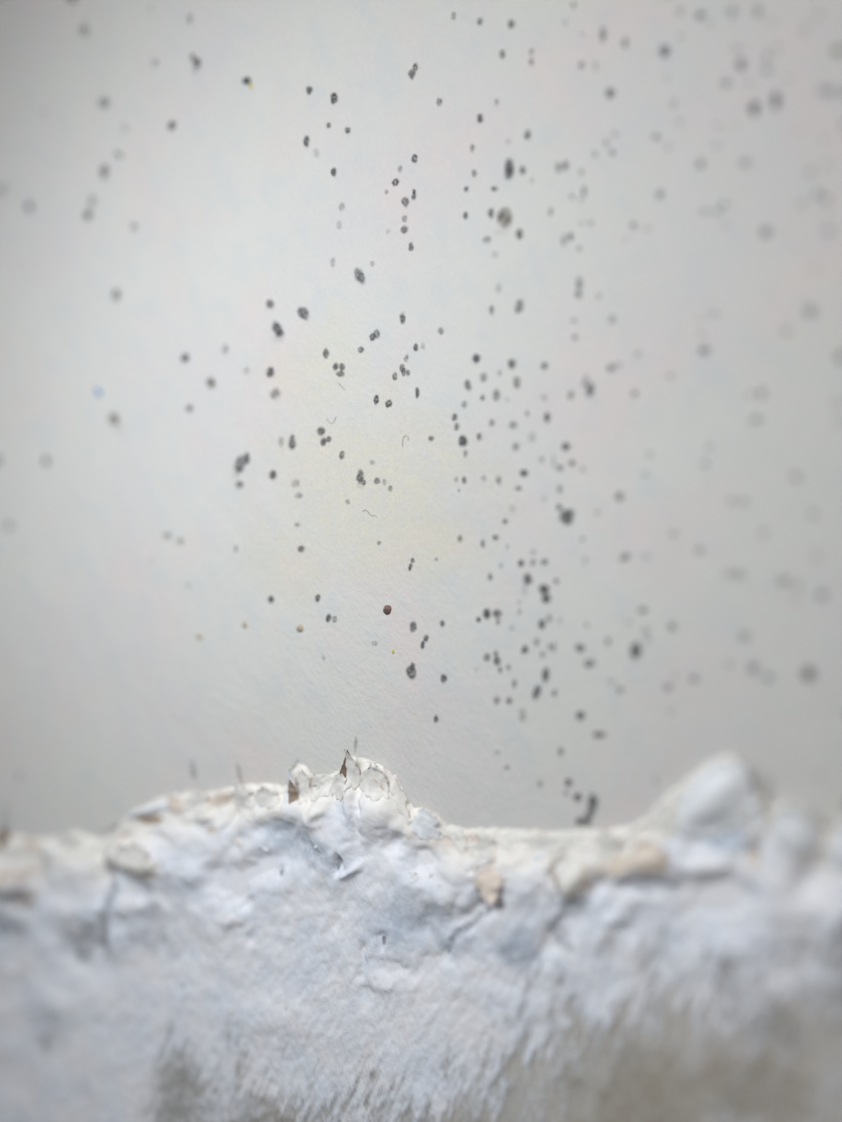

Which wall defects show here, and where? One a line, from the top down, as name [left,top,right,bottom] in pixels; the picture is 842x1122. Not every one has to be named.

damp [505,160,525,178]
damp [489,210,522,239]
damp [236,453,249,486]
damp [557,485,573,524]
damp [518,560,558,629]
damp [533,669,556,699]
peeling [0,748,842,908]
damp [0,754,842,1122]